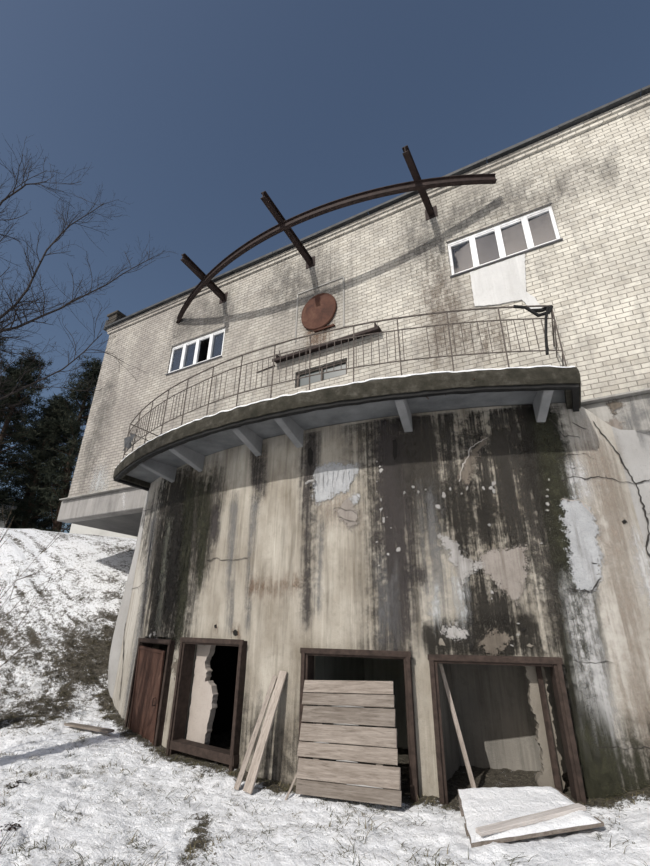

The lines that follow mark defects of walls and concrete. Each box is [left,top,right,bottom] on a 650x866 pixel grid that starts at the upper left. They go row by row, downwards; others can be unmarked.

water stain [124,466,237,710]
water stain [249,451,267,554]
water stain [300,432,321,625]
peeling [308,447,361,531]
water stain [345,408,532,661]
spalling [422,534,549,657]
peeling [545,478,607,595]
crack [549,418,650,567]